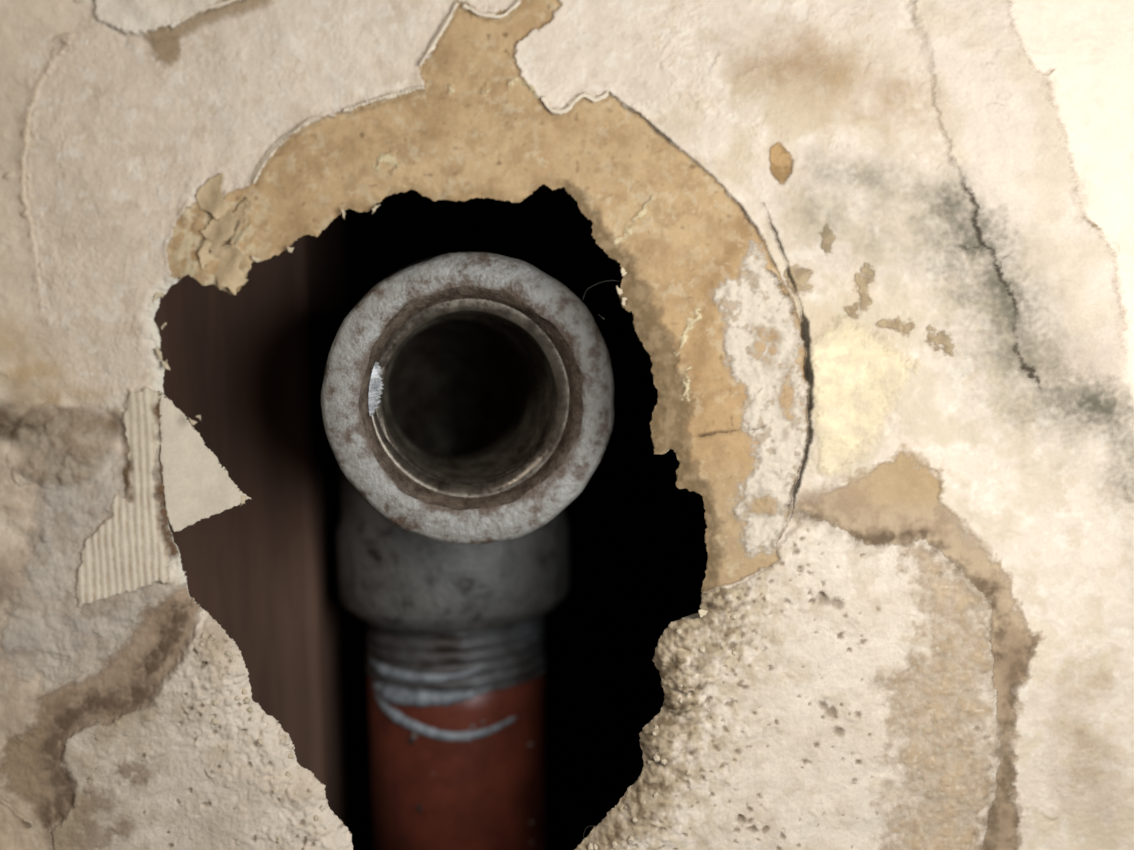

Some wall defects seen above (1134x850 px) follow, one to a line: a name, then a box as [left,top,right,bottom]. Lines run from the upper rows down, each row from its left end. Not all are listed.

peeling [94,0,266,62]
crack [609,92,677,146]
peeling [770,143,793,183]
spalling [154,321,171,370]
spalling [195,173,261,295]
crack [727,191,813,538]
crack [964,186,1041,389]
spalling [159,391,252,532]
spalling [341,184,1040,850]
spalling [0,450,373,850]